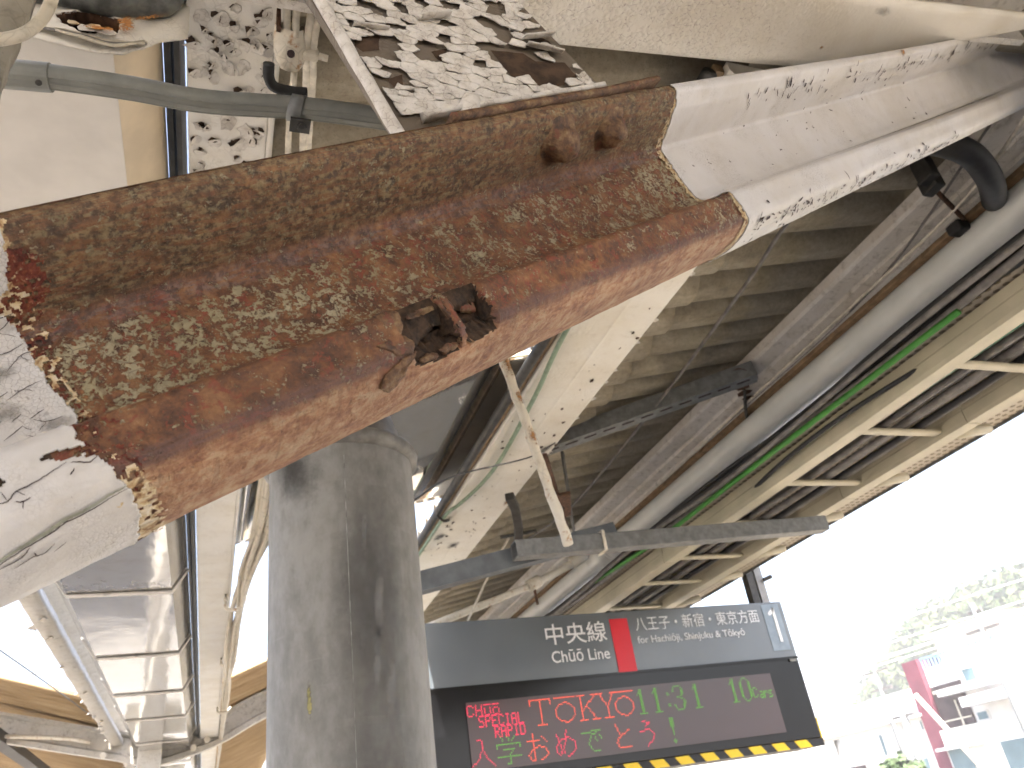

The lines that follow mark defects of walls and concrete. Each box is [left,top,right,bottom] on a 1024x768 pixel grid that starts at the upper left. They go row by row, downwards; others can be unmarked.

peeling [183,3,274,94]
peeling [329,2,474,75]
peeling [387,61,440,90]
peeling [467,0,577,86]
peeling [190,115,265,172]
crack [0,313,63,441]
corrosion [0,86,748,532]
spalling [373,299,476,393]
crack [0,455,98,509]
crack [0,486,127,569]